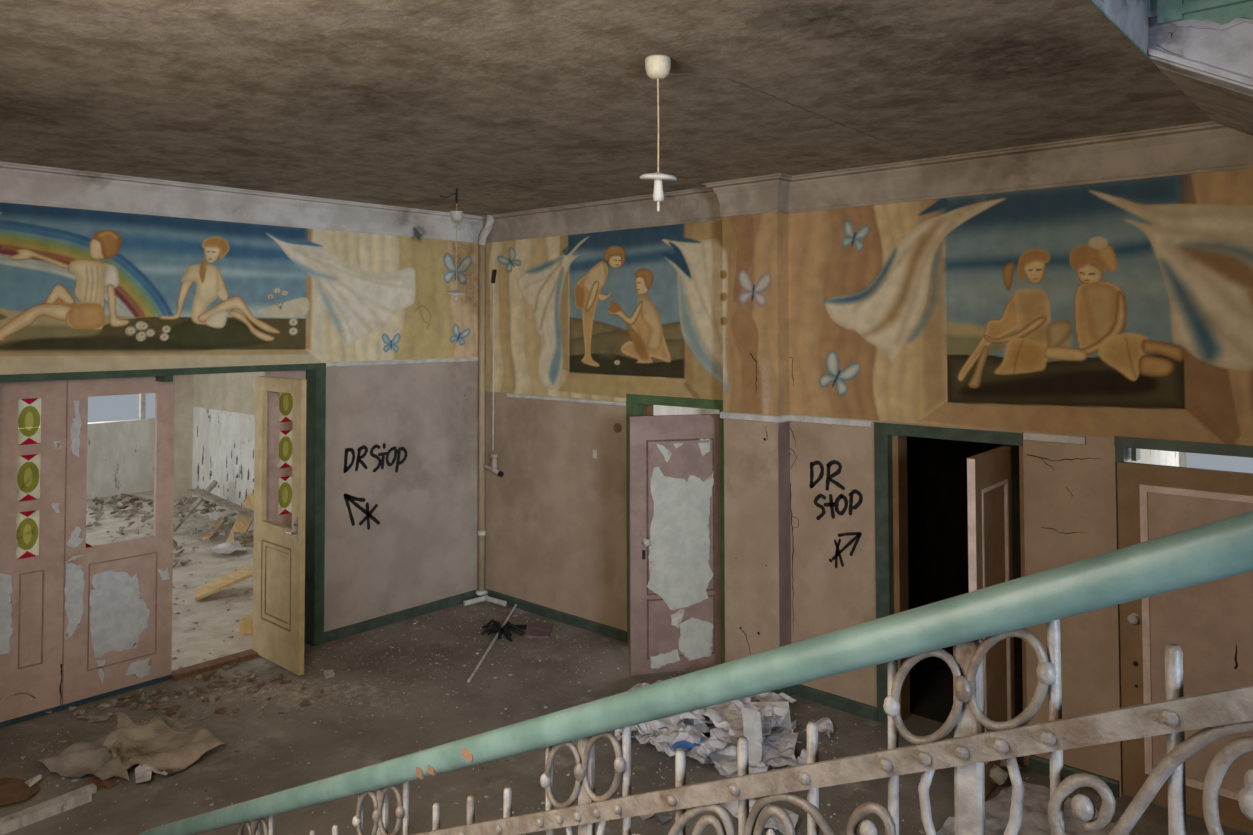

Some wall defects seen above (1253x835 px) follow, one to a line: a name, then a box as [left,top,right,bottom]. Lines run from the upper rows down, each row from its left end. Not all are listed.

peeling [53,400,82,457]
peeling [698,438,711,456]
crack [1027,454,1101,496]
peeling [647,443,714,669]
peeling [0,574,13,655]
peeling [64,526,151,683]